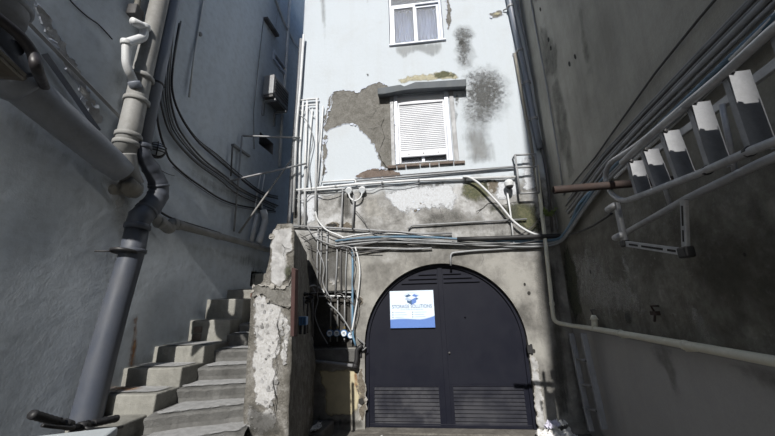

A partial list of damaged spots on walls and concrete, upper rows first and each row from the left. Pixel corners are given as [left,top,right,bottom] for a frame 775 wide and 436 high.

flaking render [34,1,103,125]
flaking render [400,71,457,83]
damp [457,29,470,63]
damp [468,73,503,118]
flaking render [321,81,401,179]
peeling [300,194,322,223]
peeling [246,226,293,434]
peeling [320,368,368,421]